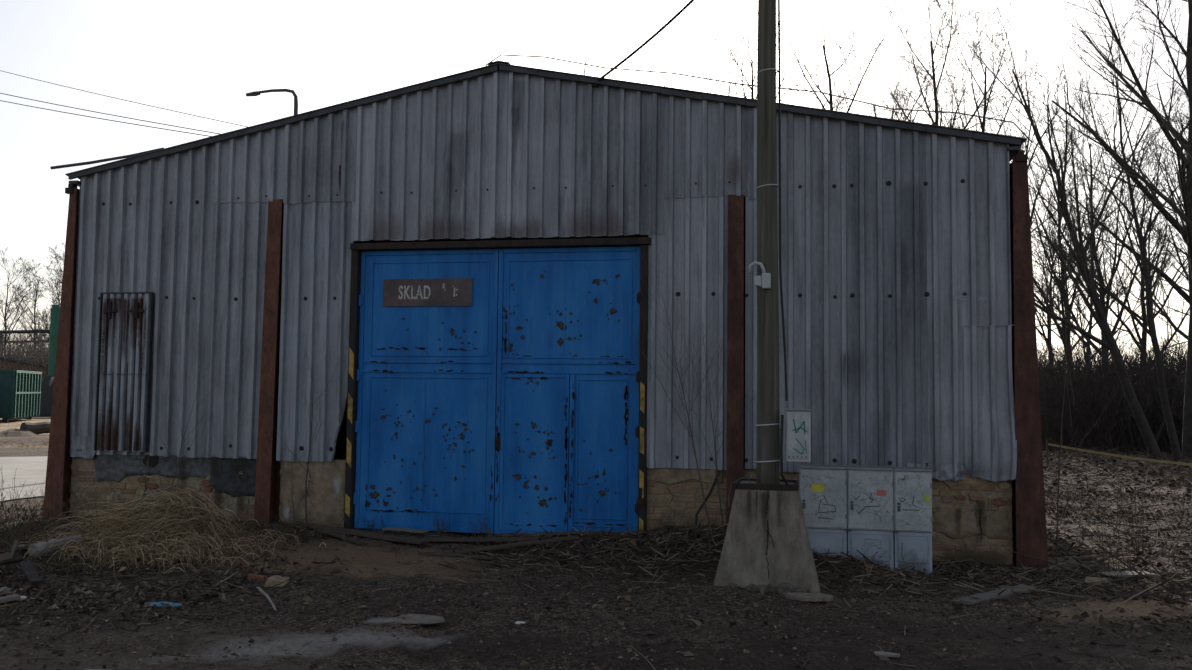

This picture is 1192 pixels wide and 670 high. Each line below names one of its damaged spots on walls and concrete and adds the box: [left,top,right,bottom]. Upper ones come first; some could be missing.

corrosion [101,297,146,367]
peeling [369,322,478,373]
peeling [502,305,548,392]
peeling [548,307,582,365]
peeling [588,274,621,322]
spalling [94,454,257,497]
peeling [365,482,437,513]
peeling [375,404,474,481]
peeling [490,356,632,527]
crack [766,490,774,579]